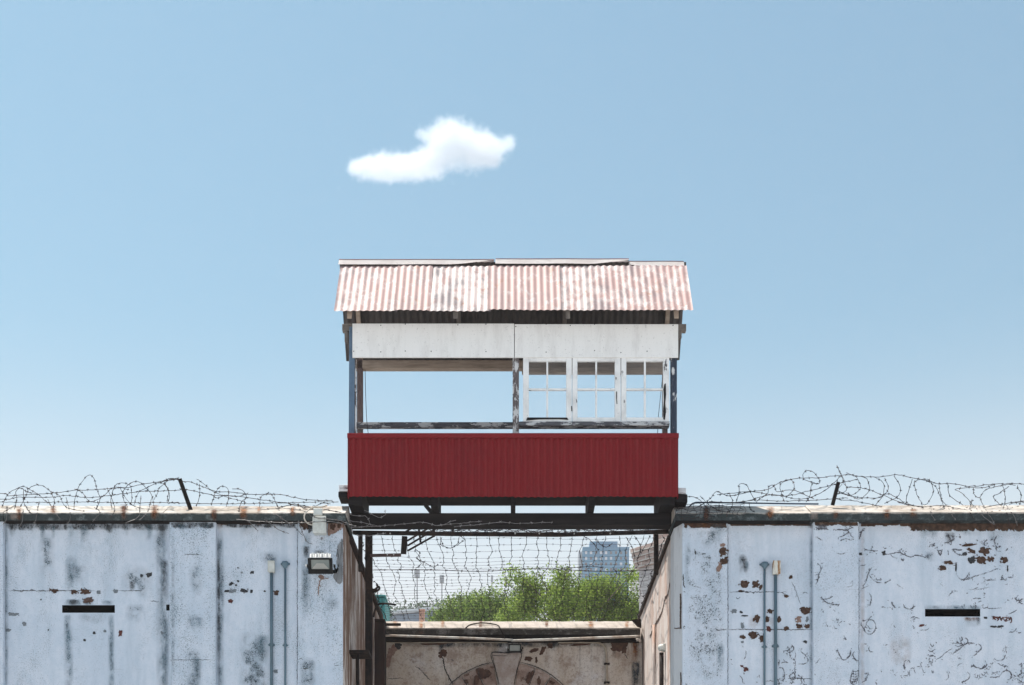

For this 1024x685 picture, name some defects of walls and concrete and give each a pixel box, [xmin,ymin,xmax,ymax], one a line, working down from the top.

peeling [684,522,1024,572]
peeling [40,587,118,604]
leakage [9,523,294,685]
peeling [224,567,279,603]
peeling [738,580,763,593]
peeling [731,606,812,644]
peeling [464,668,492,685]